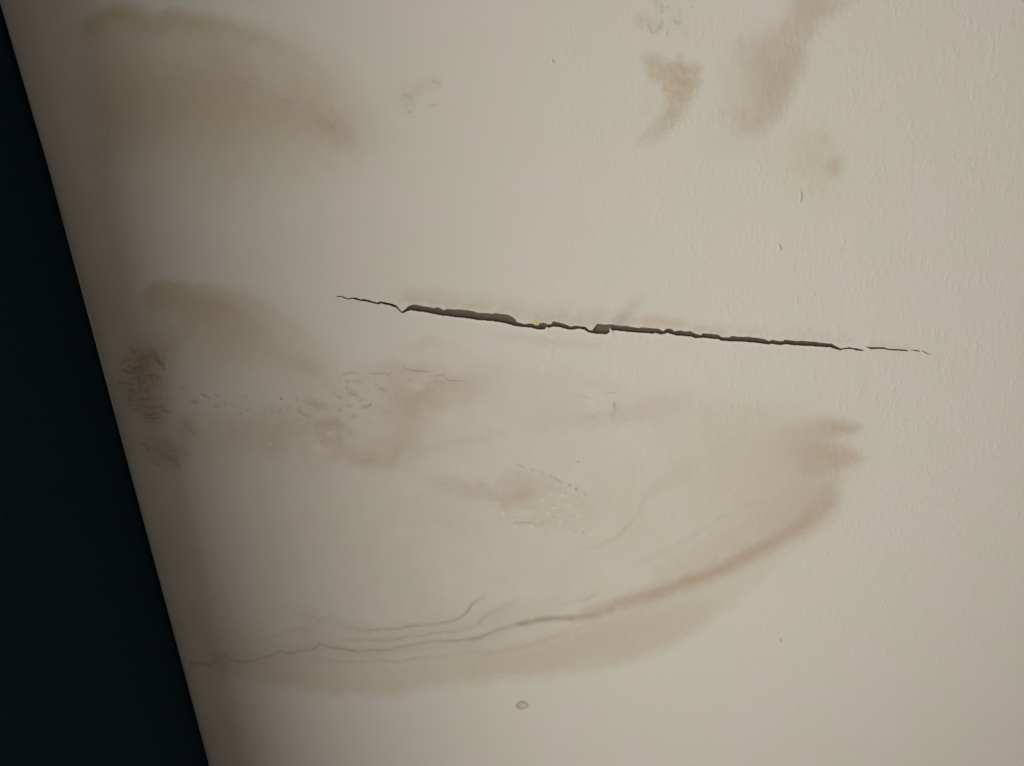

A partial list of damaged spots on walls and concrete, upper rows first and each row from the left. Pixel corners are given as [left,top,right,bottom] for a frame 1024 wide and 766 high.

crack [336,295,930,355]
leakage [614,423,855,606]